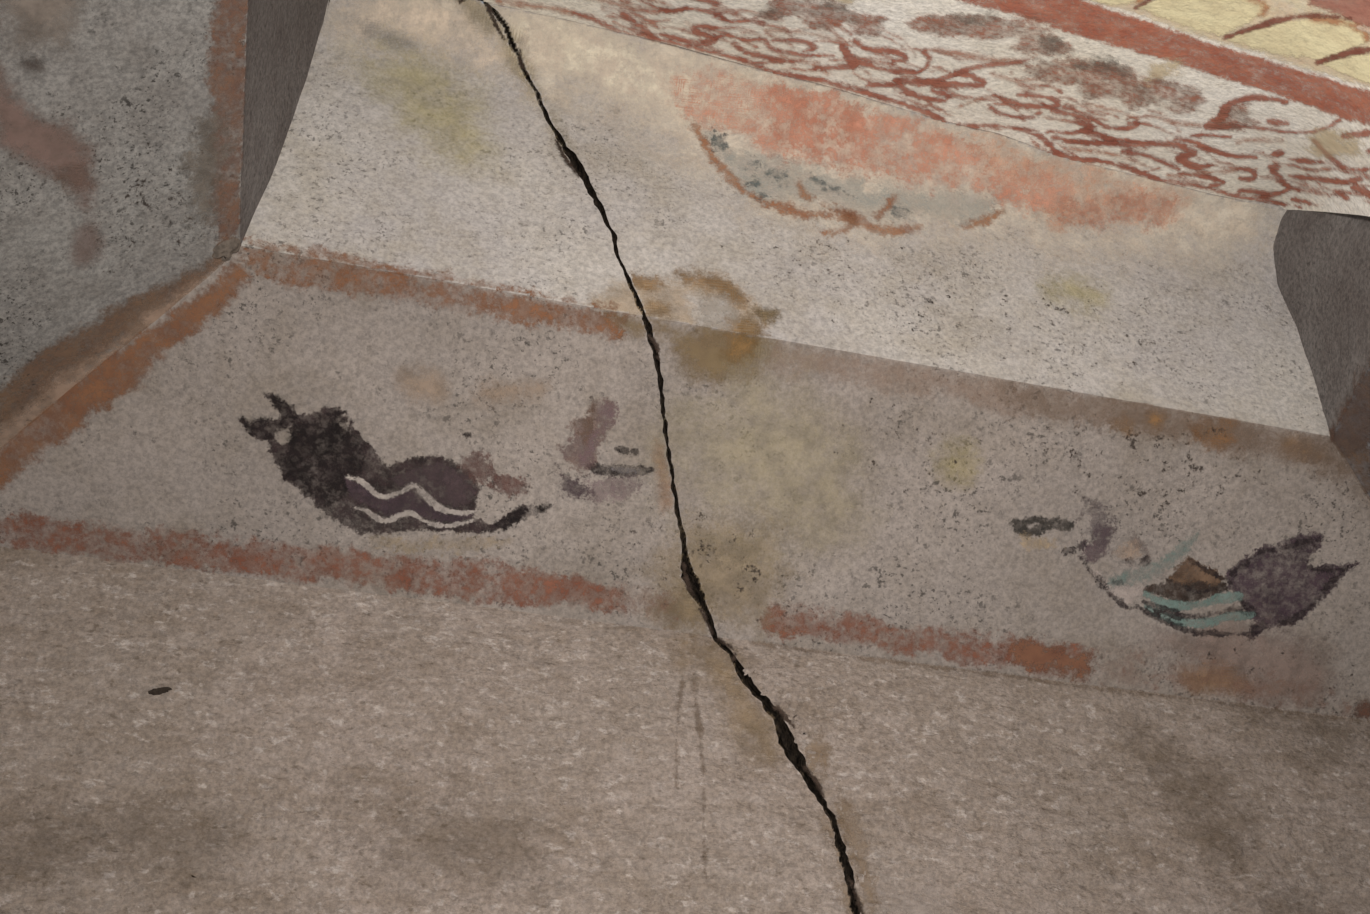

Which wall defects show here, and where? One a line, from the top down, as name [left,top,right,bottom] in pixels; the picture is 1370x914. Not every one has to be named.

crack [459,0,903,914]
damp [617,240,1179,381]